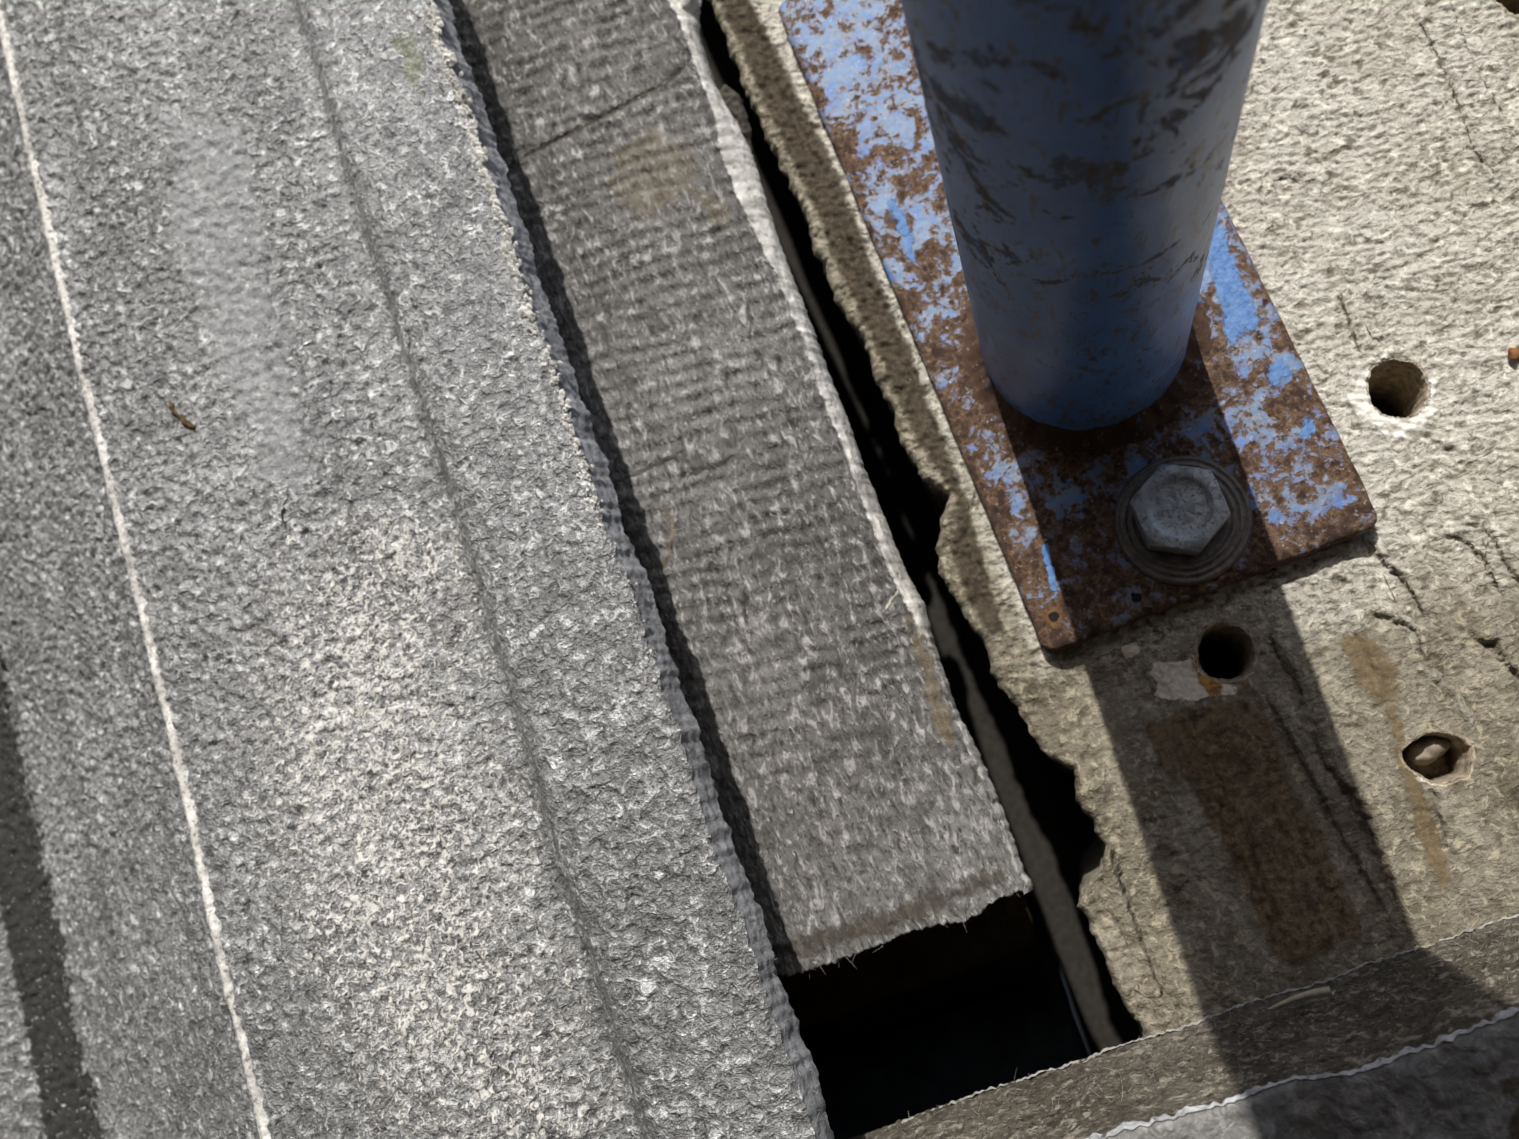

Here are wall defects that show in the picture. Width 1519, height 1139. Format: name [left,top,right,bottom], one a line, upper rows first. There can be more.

crack [1413,4,1506,180]
spalling [1121,642,1239,701]
crack [1354,540,1425,667]
crack [1445,523,1519,596]
crack [1468,622,1519,677]
water stain [1144,682,1361,964]
crack [1262,633,1396,916]
crack [1430,789,1450,854]